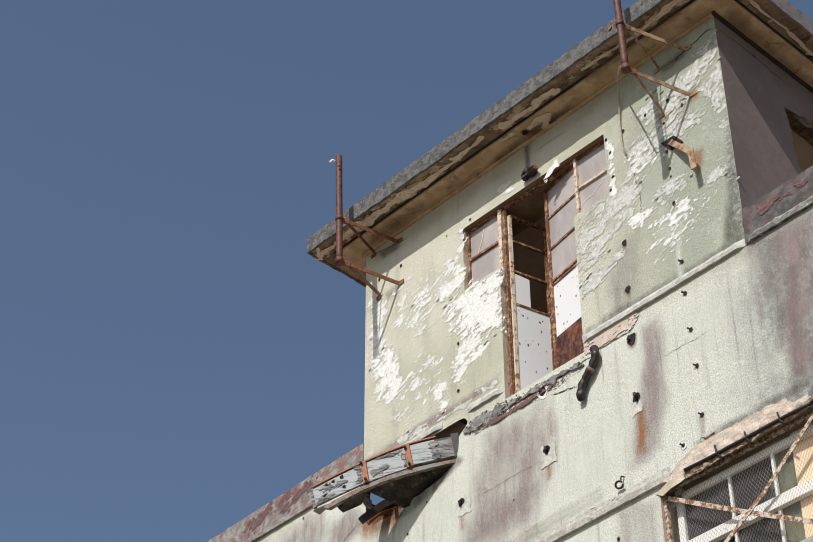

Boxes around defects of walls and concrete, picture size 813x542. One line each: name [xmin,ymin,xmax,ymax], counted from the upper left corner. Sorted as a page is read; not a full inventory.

peeling [497,180,515,196]
peeling [543,159,560,183]
peeling [576,29,744,298]
peeling [366,226,507,444]
spalling [463,312,639,434]
spalling [655,386,813,496]